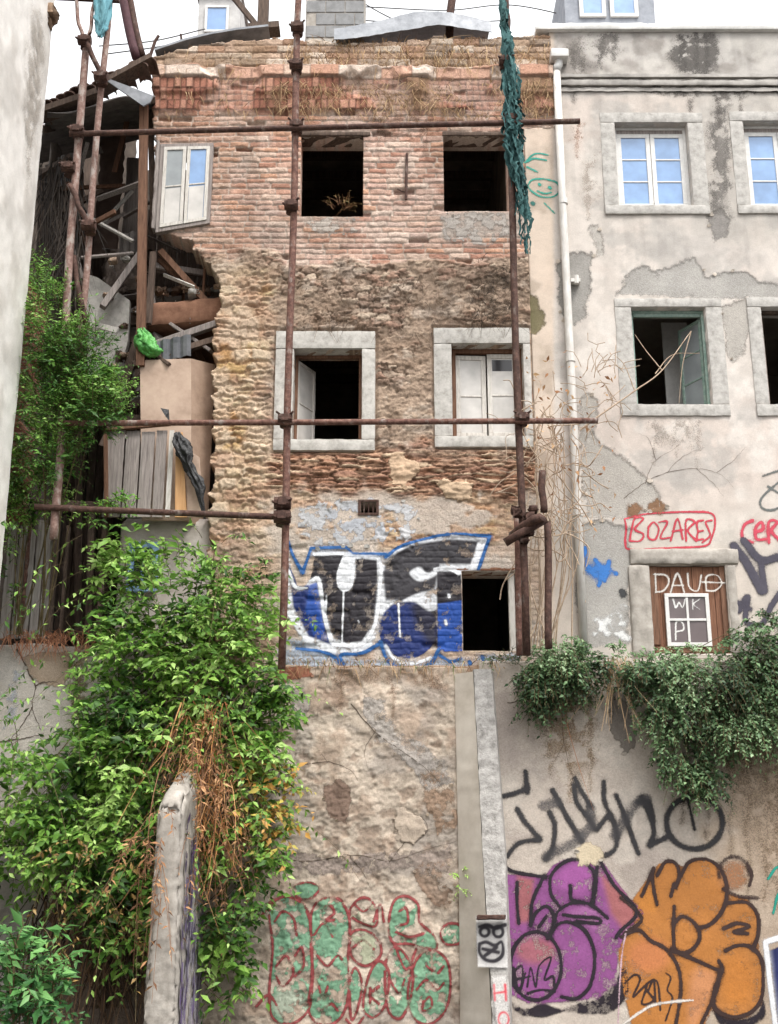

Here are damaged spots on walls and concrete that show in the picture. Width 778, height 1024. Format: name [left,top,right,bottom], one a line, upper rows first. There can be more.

spalling [706,208,731,240]
peeling [530,224,604,335]
peeling [616,258,778,363]
crack [624,433,743,498]
peeling [298,497,420,556]
peeling [575,393,670,648]
crack [0,648,59,746]
crack [305,704,452,800]
peeling [285,697,458,909]